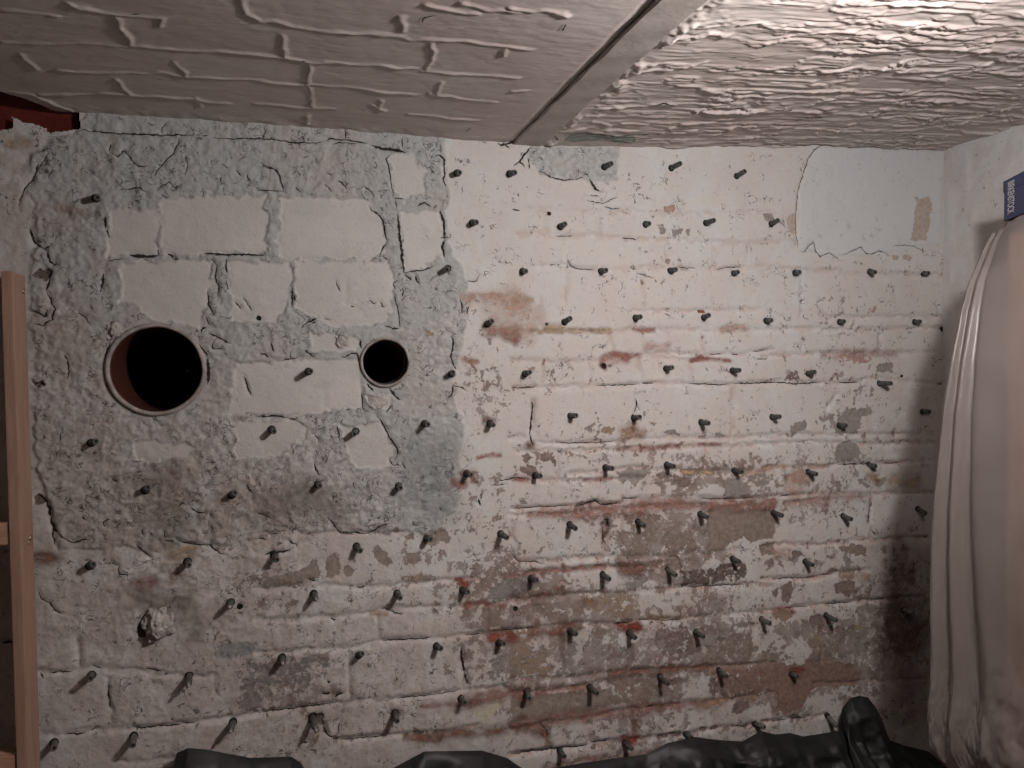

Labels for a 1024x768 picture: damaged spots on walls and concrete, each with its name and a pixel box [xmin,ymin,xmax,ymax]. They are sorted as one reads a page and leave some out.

crack [87,109,449,329]
crack [795,145,921,259]
crack [29,229,118,401]
crack [199,253,264,384]
crack [244,288,406,474]
crack [512,386,612,444]
peeling [616,467,696,488]
peeling [834,405,873,462]
flaking render [579,505,776,621]
peeling [834,542,867,598]
flaking render [474,626,674,723]
flaking render [658,596,858,715]